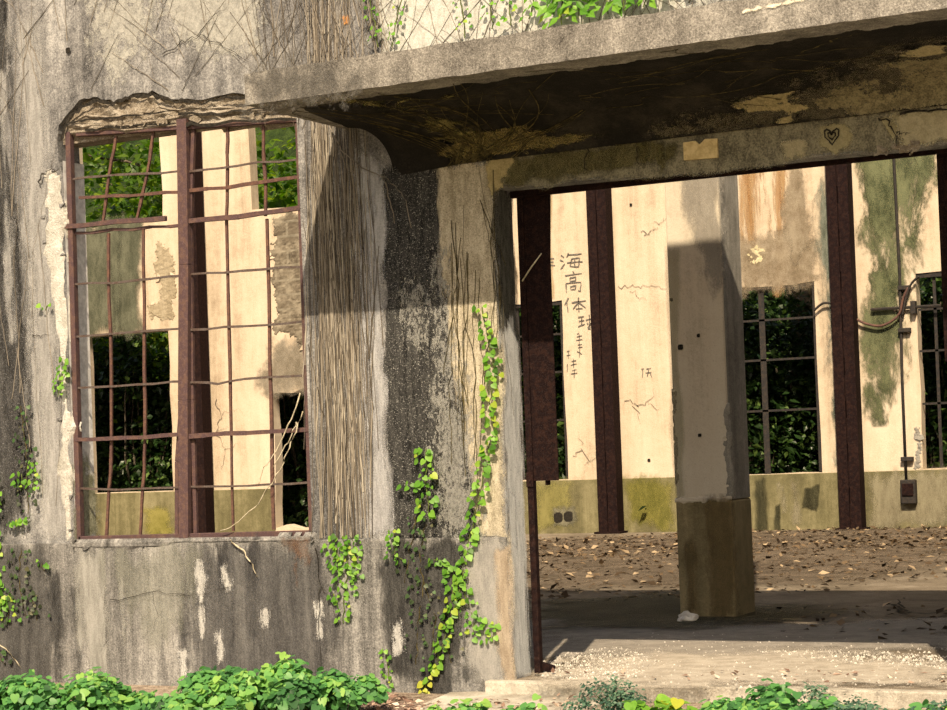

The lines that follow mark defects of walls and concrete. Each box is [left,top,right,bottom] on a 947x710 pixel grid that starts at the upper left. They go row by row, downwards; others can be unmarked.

spalling [60,92,297,141]
crack [878,108,947,146]
damp [856,155,938,426]
flaking render [41,168,90,550]
damp [353,149,513,694]
damp [536,483,576,531]
damp [625,475,673,532]
damp [72,548,127,673]
damp [178,650,190,677]
damp [194,559,224,663]
damp [313,600,325,639]
damp [527,496,844,629]